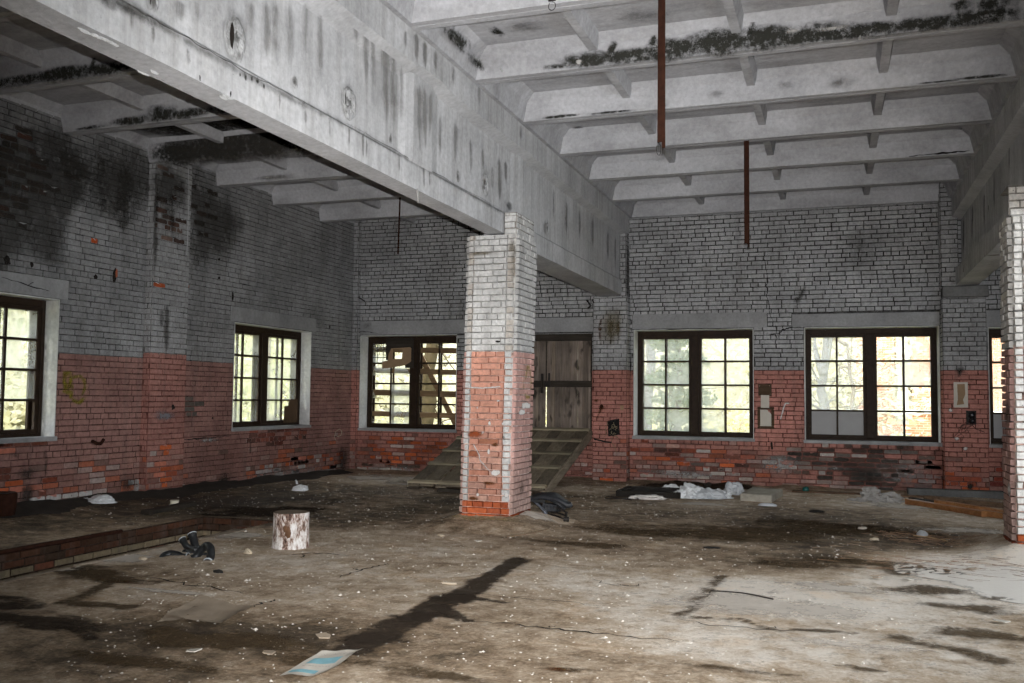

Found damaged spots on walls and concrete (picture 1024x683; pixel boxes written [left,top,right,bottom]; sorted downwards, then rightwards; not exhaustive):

damp [0,58,132,88]
damp [444,29,482,70]
damp [545,0,1019,68]
damp [0,106,298,270]
peeling [630,439,1005,491]
crack [472,619,844,642]